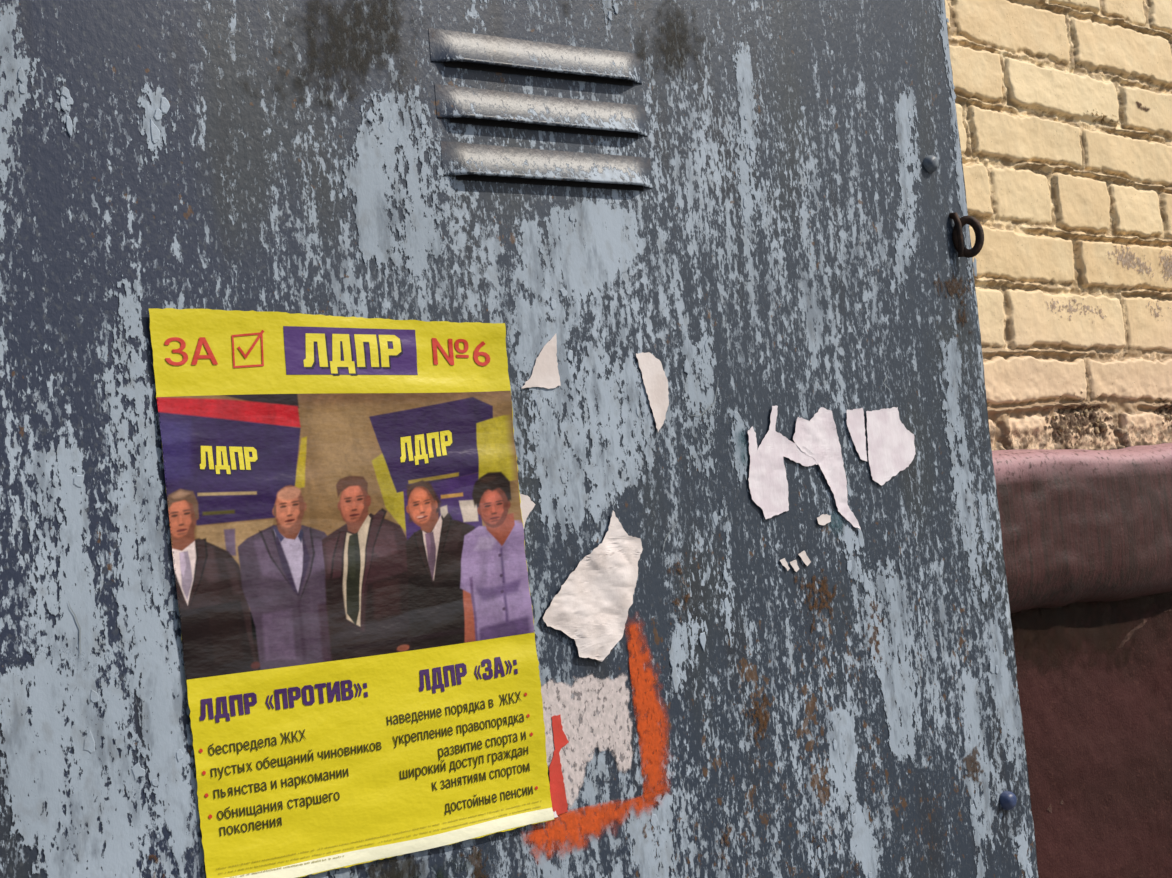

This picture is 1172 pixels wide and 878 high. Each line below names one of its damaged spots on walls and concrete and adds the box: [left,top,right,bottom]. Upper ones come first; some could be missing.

peeling [342,84,450,281]
peeling [499,196,656,542]
rust [933,272,974,333]
peeling [0,272,200,878]
rust [741,693,774,749]
rust [794,569,836,662]
peeling [826,697,883,878]
rust [864,601,885,662]
peeling [836,515,922,763]
rust [963,742,984,786]
peeling [939,337,1025,878]
leakage [1012,591,1172,668]